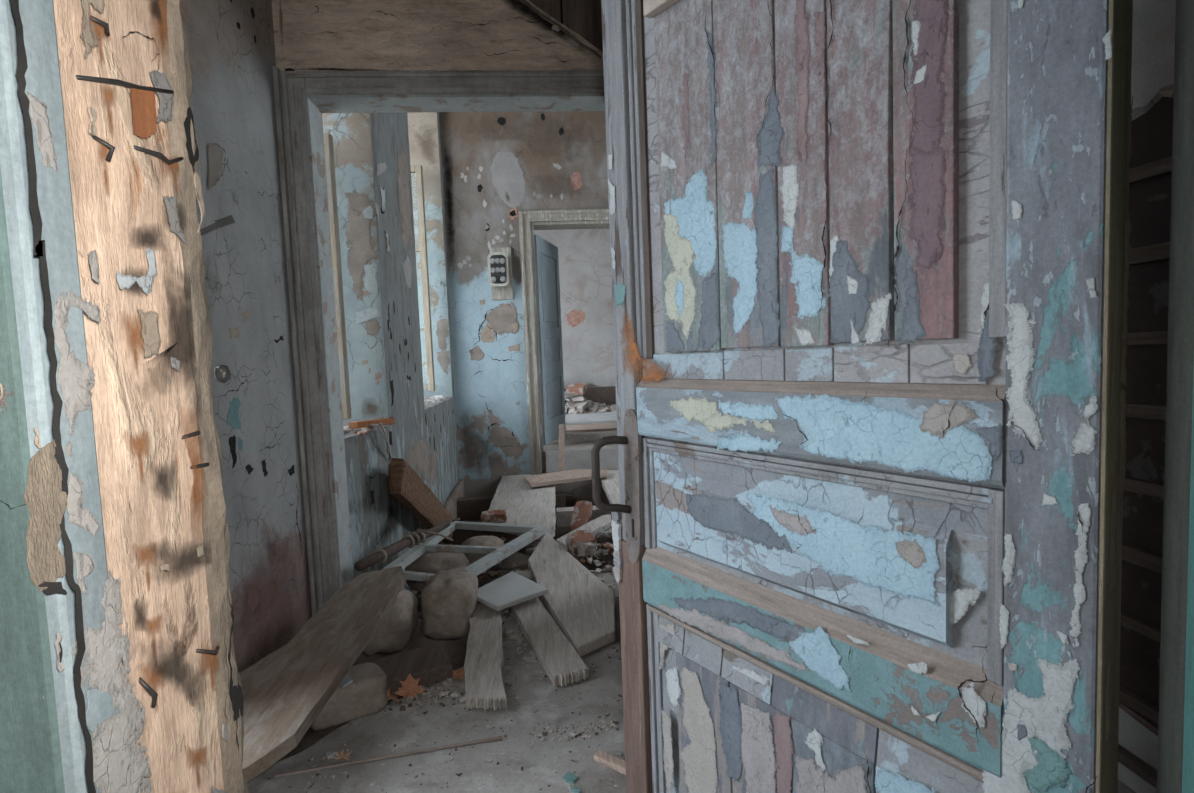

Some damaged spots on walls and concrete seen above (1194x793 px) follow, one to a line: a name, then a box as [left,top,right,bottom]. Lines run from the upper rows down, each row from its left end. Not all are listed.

crack [0,0,96,793]
flaking render [345,145,416,445]
flaking render [469,299,520,361]
flaking render [460,151,582,248]
peeling [660,0,892,355]
peeling [669,282,1048,483]
peeling [907,0,950,270]
peeling [1102,29,1112,60]
peeling [657,597,934,793]
peeling [686,492,981,625]
peeling [961,682,987,728]
peeling [981,503,1091,793]